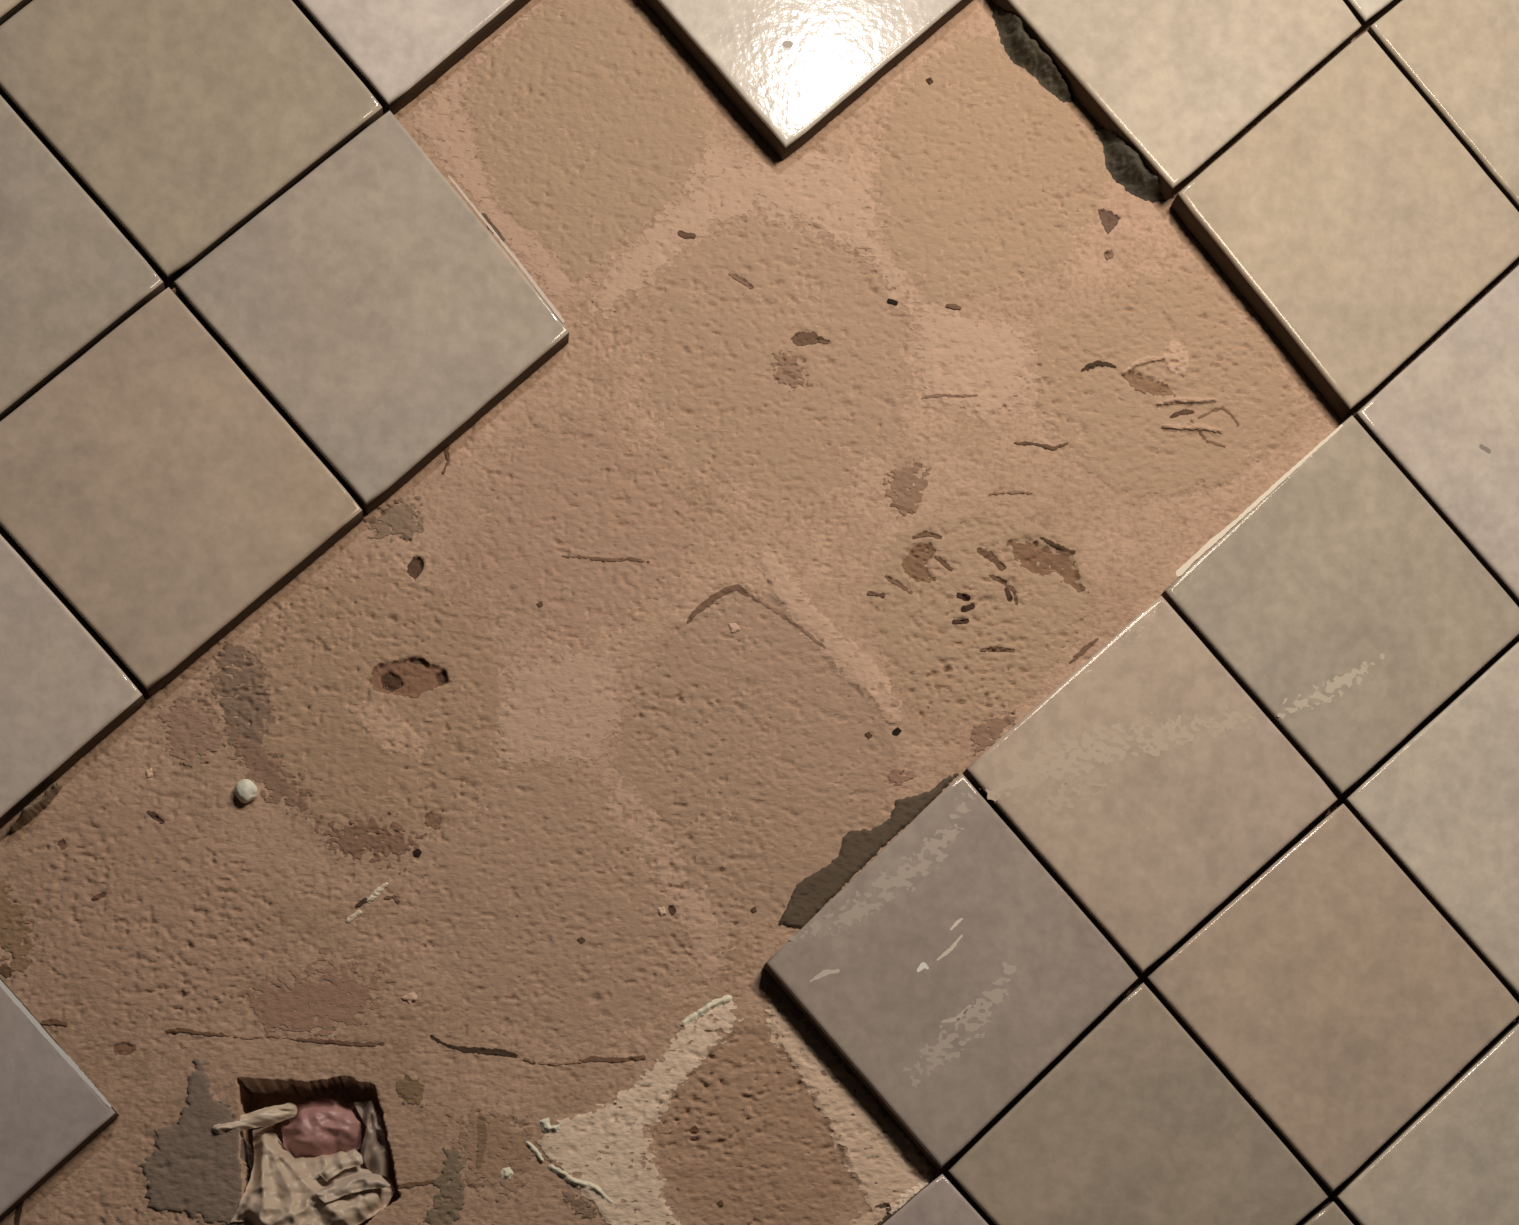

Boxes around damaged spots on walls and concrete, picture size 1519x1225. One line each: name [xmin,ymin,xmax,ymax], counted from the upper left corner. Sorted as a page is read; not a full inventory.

peeling [448,175,565,323]
spalling [1098,208,1120,260]
hole [767,331,831,390]
spalling [1123,370,1176,397]
spalling [883,457,935,517]
peeling [1176,424,1343,576]
spalling [407,556,424,579]
spalling [885,530,953,593]
spalling [977,539,1089,605]
hole [370,656,449,698]
peeling [0,980,111,1108]
spalling [526,1117,563,1163]